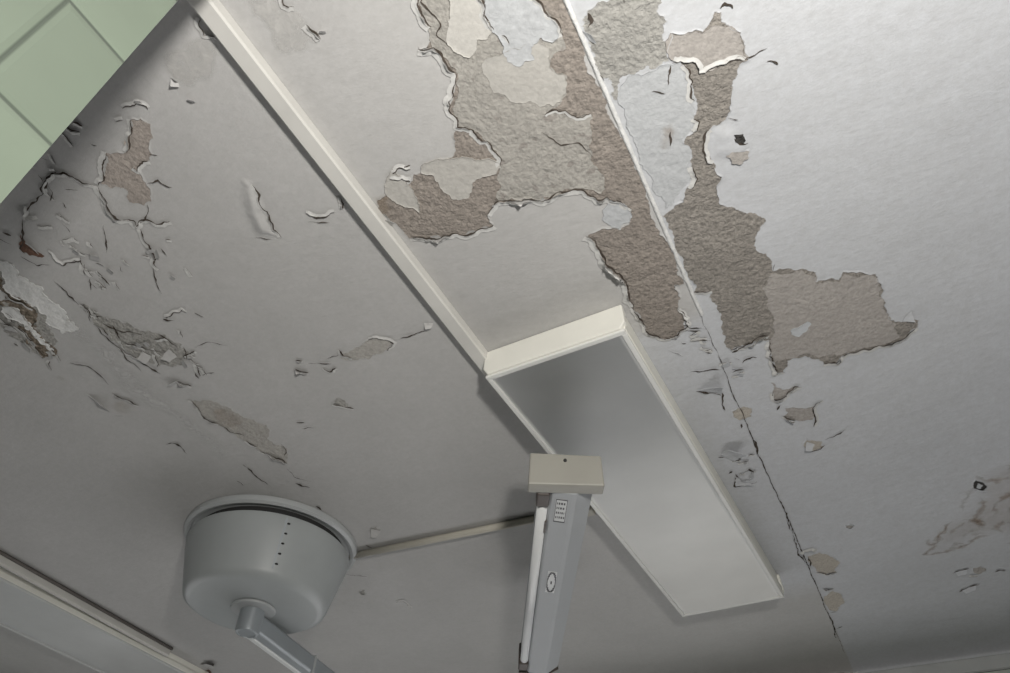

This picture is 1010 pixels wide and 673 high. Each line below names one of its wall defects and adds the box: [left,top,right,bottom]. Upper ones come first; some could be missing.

peeling [91,99,168,207]
spalling [0,232,47,259]
spalling [0,258,79,370]
crack [20,154,221,377]
spalling [306,198,344,223]
peeling [294,323,433,375]
peeling [375,0,920,428]
peeling [168,381,290,465]
crack [670,316,843,649]
peeling [800,548,842,576]